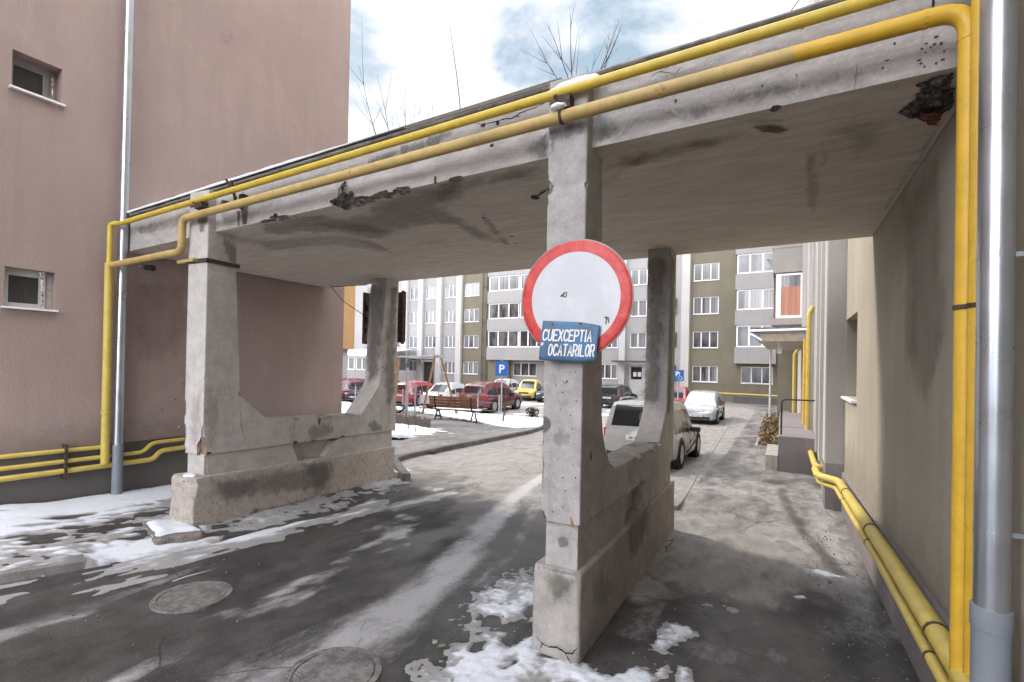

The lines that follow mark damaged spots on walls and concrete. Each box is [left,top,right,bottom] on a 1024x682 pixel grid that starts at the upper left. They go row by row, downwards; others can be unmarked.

peeling [898,35,956,126]
spalling [330,181,411,210]
spalling [178,399,212,456]
leakage [216,464,327,498]
crack [537,638,577,664]